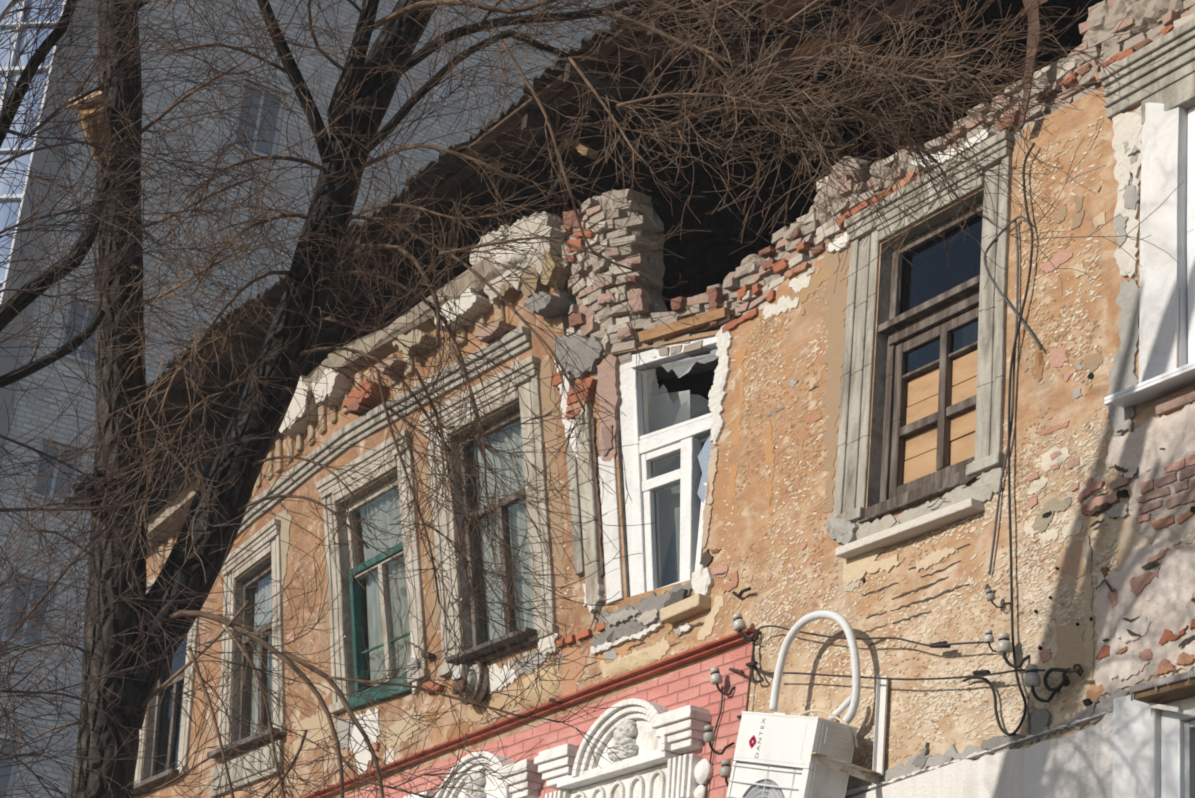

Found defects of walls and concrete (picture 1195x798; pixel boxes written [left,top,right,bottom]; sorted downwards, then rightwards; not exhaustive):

flaking render [279,356,407,438]
flaking render [432,0,1195,702]